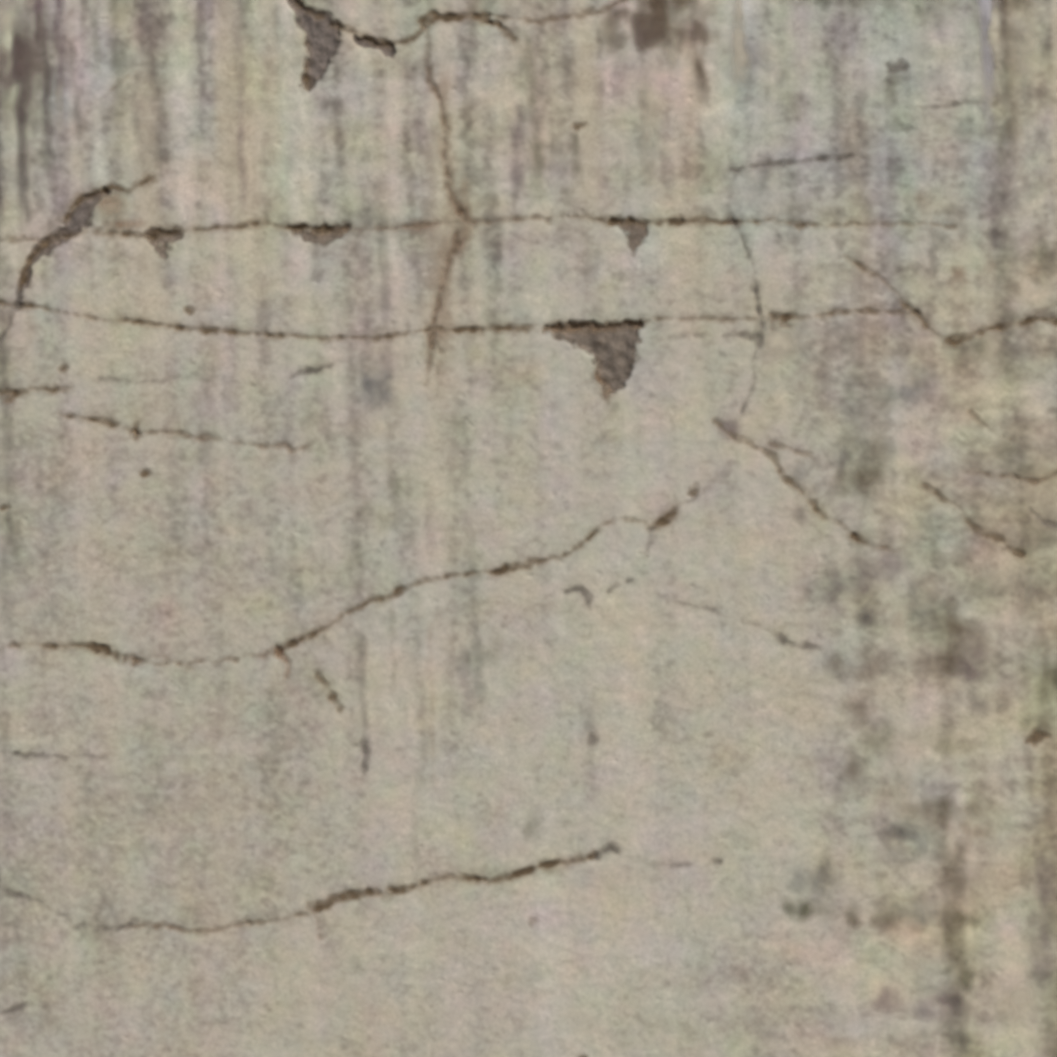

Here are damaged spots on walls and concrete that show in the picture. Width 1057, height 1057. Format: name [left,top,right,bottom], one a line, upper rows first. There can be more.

spalling [288,0,340,91]
spalling [353,36,396,58]
crack [332,11,516,46]
water stain [639,0,667,41]
water stain [13,36,27,190]
spalling [292,224,350,245]
spalling [611,219,648,251]
crack [595,217,759,256]
spalling [545,321,643,398]
crack [349,530,597,612]
crack [463,845,618,882]
crack [297,881,428,915]